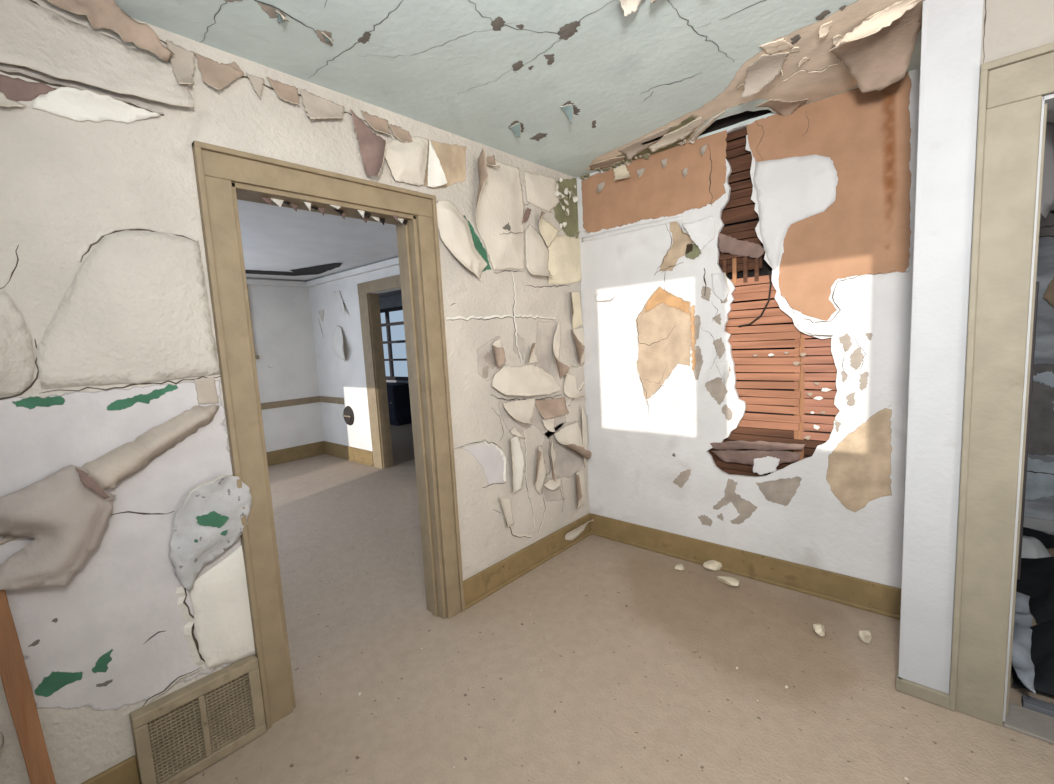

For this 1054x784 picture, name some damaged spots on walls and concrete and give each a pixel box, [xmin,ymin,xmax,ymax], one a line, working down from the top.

crack [201,0,614,94]
peeling [1039,122,1054,238]
peeling [29,0,925,528]
peeling [0,223,252,711]
peeling [1025,364,1054,500]
crack [0,536,17,545]
peeling [565,519,594,541]